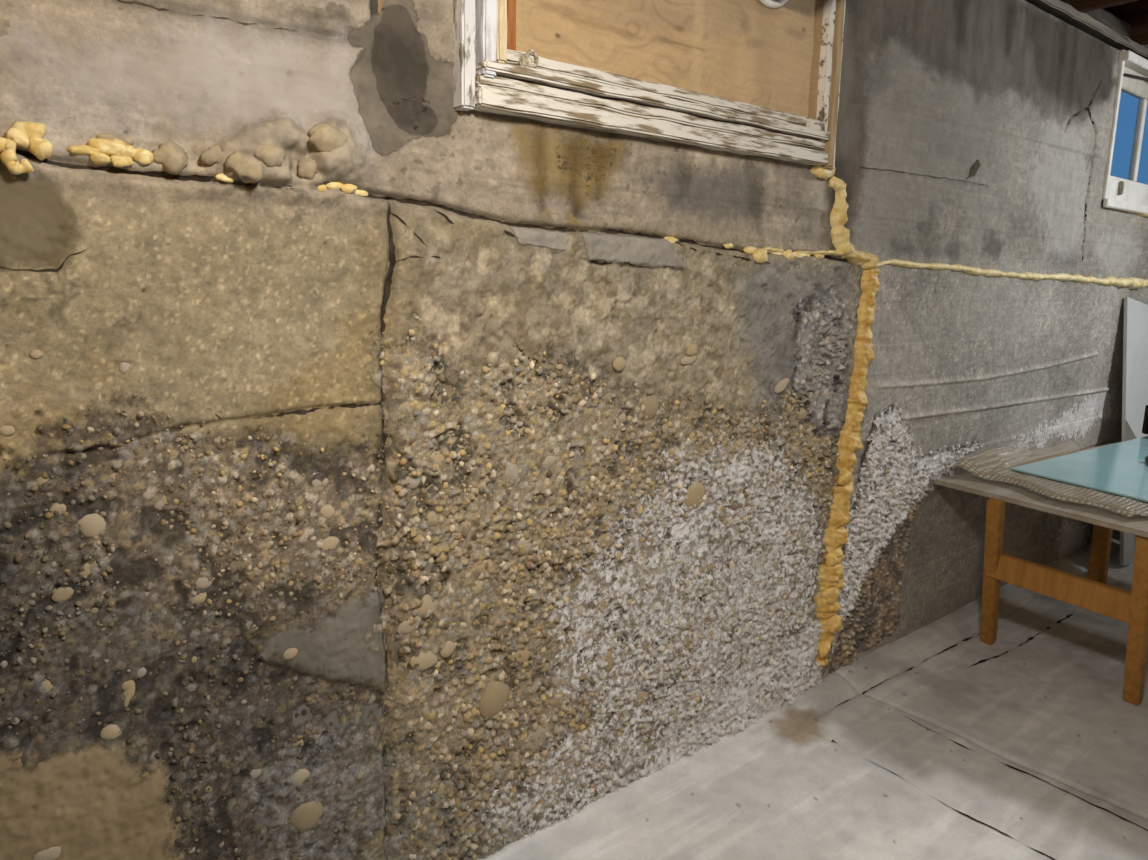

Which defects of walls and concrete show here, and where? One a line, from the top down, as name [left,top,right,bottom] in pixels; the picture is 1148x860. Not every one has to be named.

crack [118,0,345,40]
damp [7,0,460,156]
damp [0,161,76,266]
crack [0,248,88,281]
crack [16,149,770,477]
crack [810,254,847,262]
crack [1067,88,1097,261]
crack [373,504,383,582]
crack [381,612,389,717]
crack [836,614,1073,706]
crack [381,746,389,860]